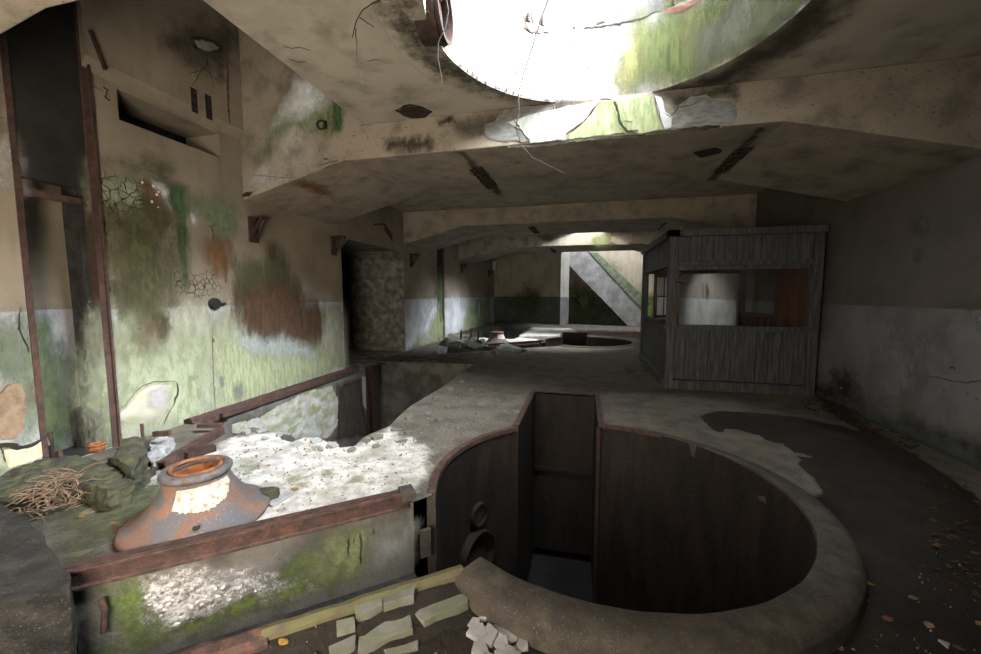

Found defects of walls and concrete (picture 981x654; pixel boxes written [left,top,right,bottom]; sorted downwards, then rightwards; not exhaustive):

spalling [662,0,699,14]
crack [566,98,640,134]
water stain [99,171,196,355]
rust [206,239,322,352]
spalling [0,382,51,468]